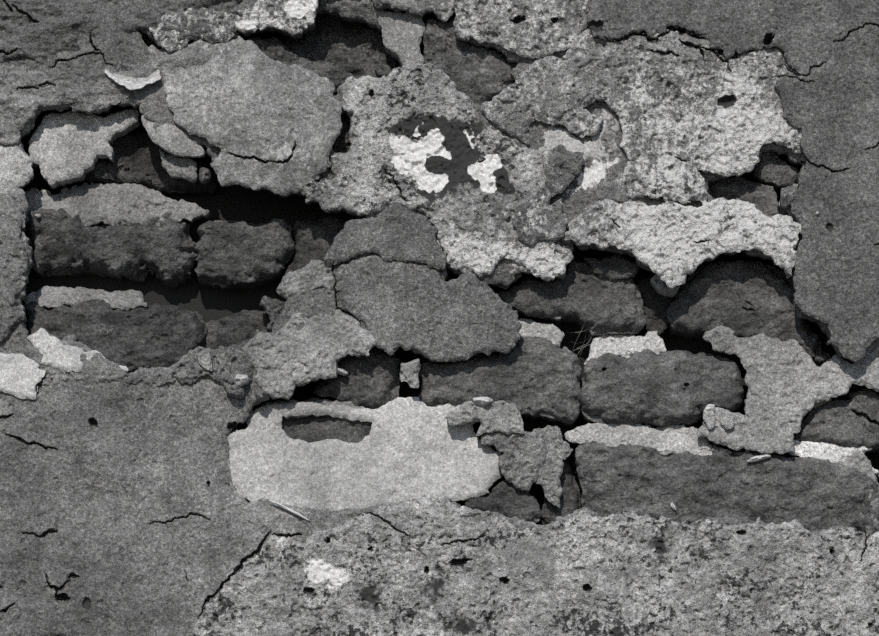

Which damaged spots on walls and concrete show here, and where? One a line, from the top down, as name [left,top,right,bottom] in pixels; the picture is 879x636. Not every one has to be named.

peeling [169,0,241,15]
peeling [0,0,105,65]
peeling [116,12,220,74]
spalling [231,0,518,105]
spalling [587,20,604,32]
crack [835,23,879,42]
crack [774,62,825,82]
spalling [0,59,879,535]
crack [0,414,51,449]
crack [24,529,55,537]
crack [46,573,79,600]
crack [198,531,302,619]